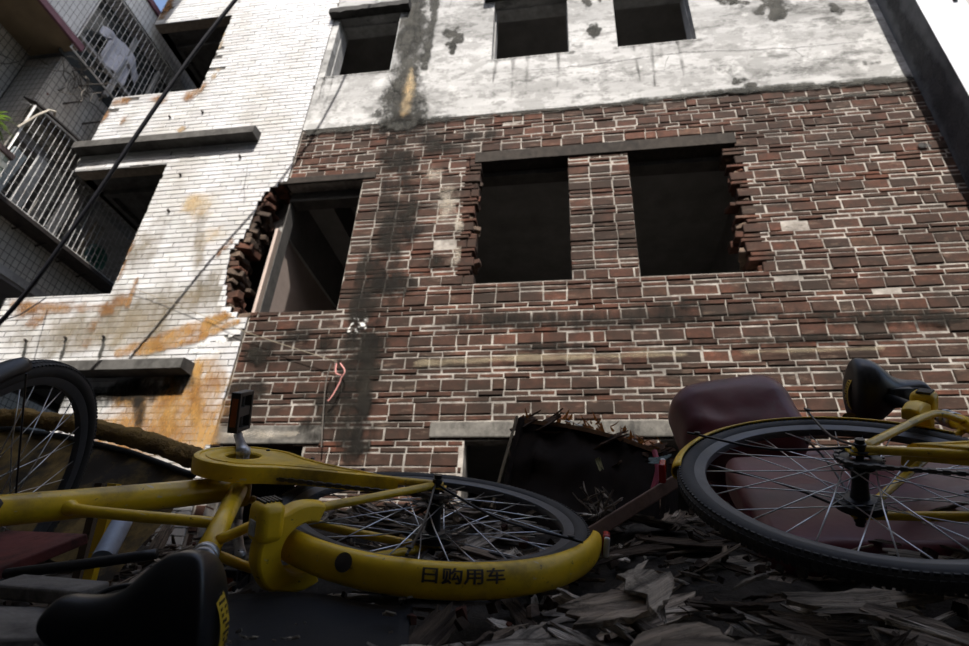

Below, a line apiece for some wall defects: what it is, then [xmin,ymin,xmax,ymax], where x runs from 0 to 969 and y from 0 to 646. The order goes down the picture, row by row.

spalling [225,185,292,318]
damp [295,0,969,461]
spalling [717,155,763,272]
rust [11,301,85,327]
damp [42,295,172,360]
rust [101,278,138,314]
rust [115,312,240,356]
damp [183,278,223,306]
damp [94,340,272,449]